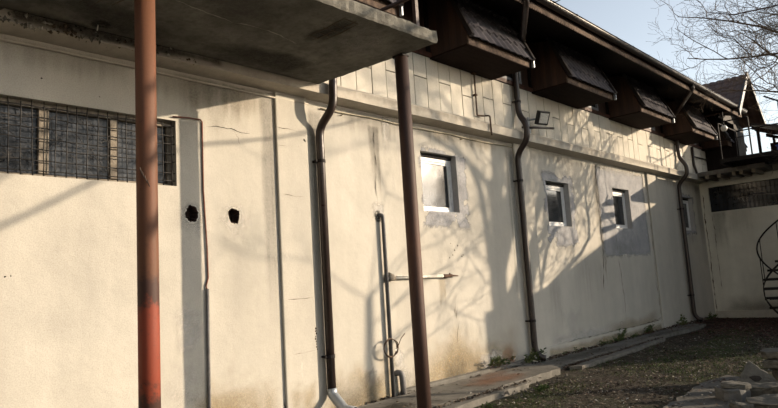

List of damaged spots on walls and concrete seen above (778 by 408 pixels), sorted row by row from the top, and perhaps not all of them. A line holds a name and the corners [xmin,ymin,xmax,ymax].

spalling [0,7,135,51]
spalling [156,44,220,65]
spalling [178,199,205,229]
spalling [222,201,247,230]
water stain [430,347,507,381]